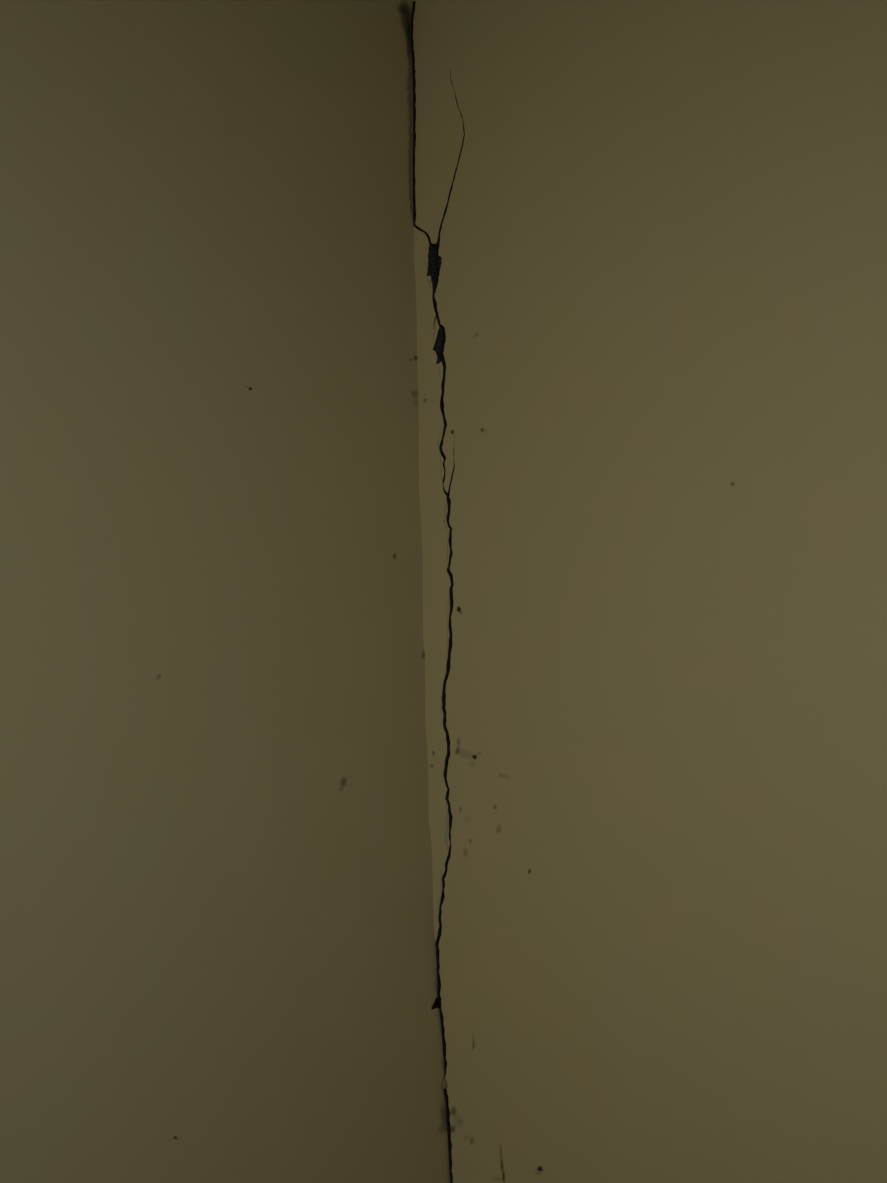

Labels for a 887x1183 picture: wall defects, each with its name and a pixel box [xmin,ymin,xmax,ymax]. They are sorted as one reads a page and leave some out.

crack [408,1,465,249]
crack [432,293,445,334]
crack [435,362,455,1183]